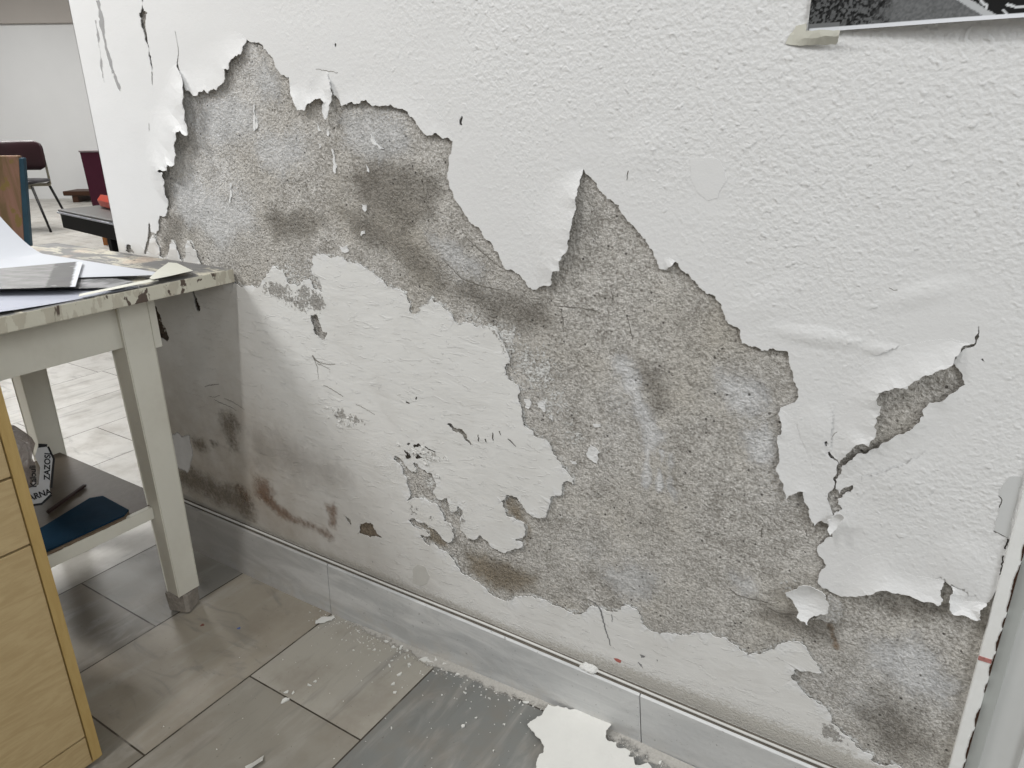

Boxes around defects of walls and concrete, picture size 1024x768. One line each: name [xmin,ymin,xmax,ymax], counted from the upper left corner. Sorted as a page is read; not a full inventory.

water stain [175,183,251,246]
peeling [144,31,995,768]